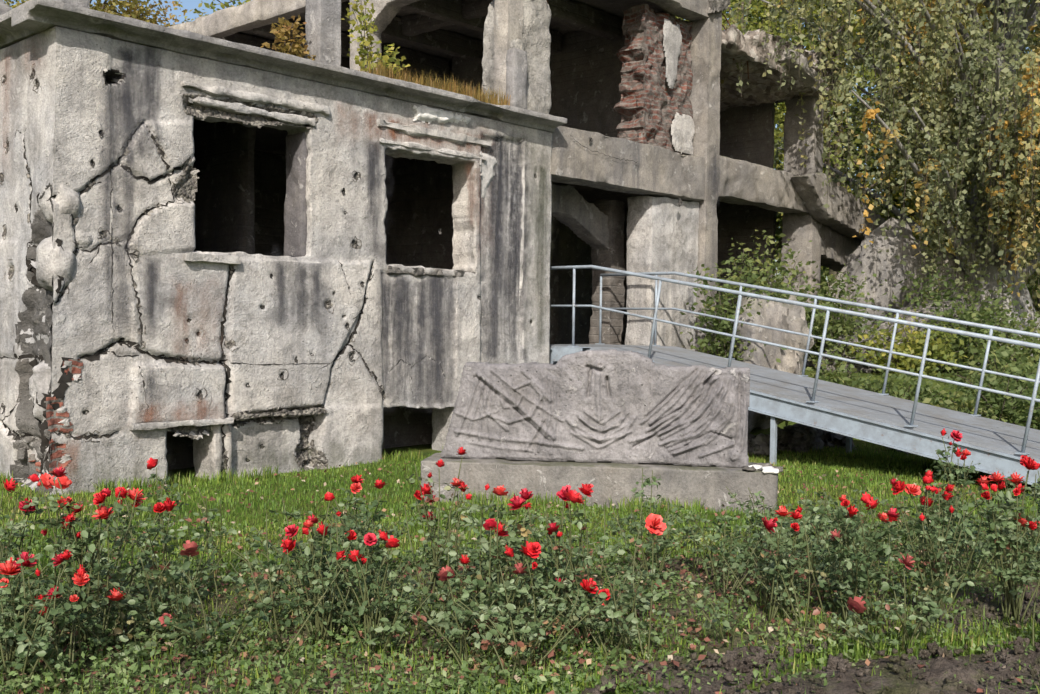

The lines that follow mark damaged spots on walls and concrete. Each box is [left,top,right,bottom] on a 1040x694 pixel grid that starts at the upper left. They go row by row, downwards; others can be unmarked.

peeling [663,18,682,89]
peeling [671,112,695,156]
leakage [480,137,527,357]
flaking render [61,359,83,381]
crack [0,122,446,495]
leakage [381,277,453,400]
flaking render [44,397,73,473]